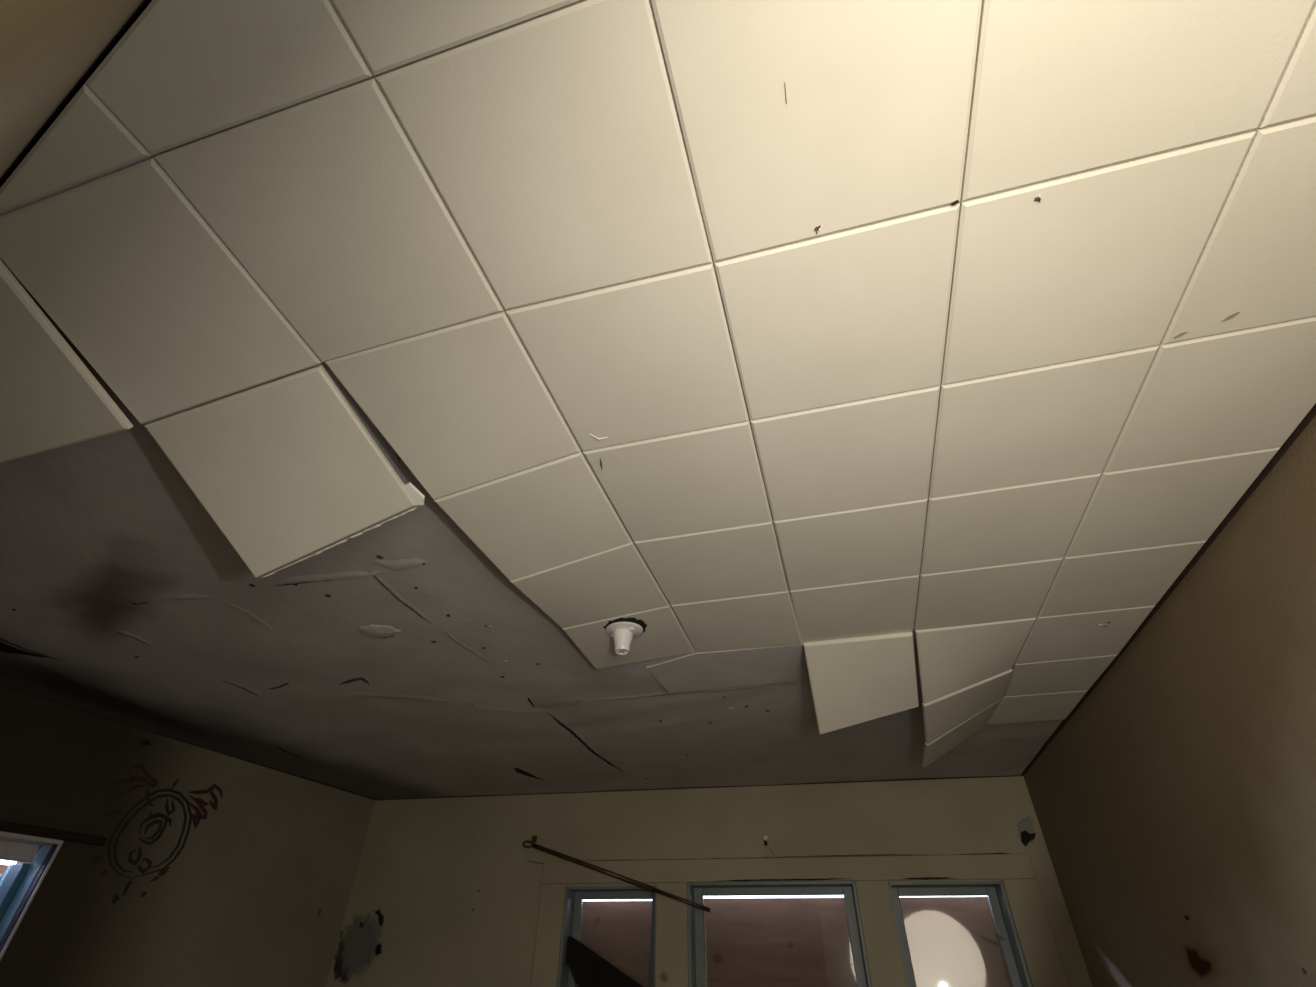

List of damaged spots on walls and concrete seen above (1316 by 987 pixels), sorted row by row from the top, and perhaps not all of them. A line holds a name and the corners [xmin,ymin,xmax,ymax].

spalling [263,507,417,577]
crack [528,698,623,772]
flaking render [334,909,384,982]